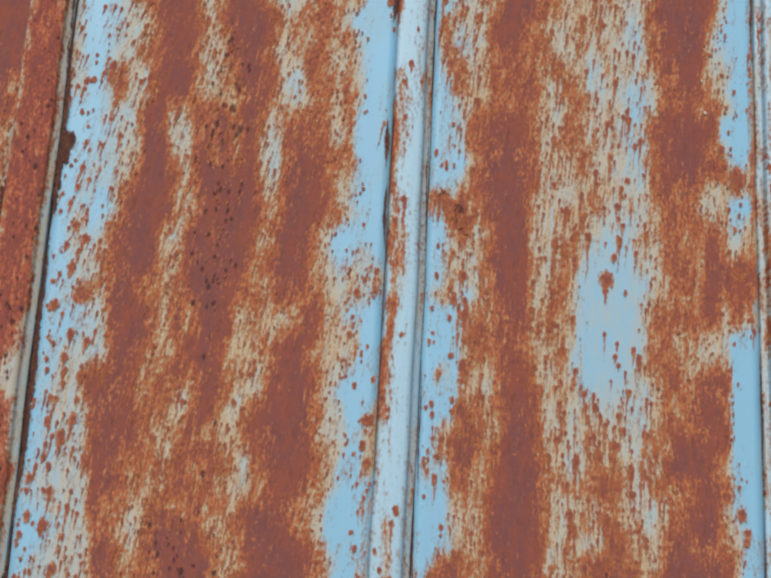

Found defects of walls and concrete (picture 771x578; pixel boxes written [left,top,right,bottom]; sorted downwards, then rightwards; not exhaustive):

peeling [0,0,31,193]
peeling [237,0,305,206]
corrosion [407,0,771,578]